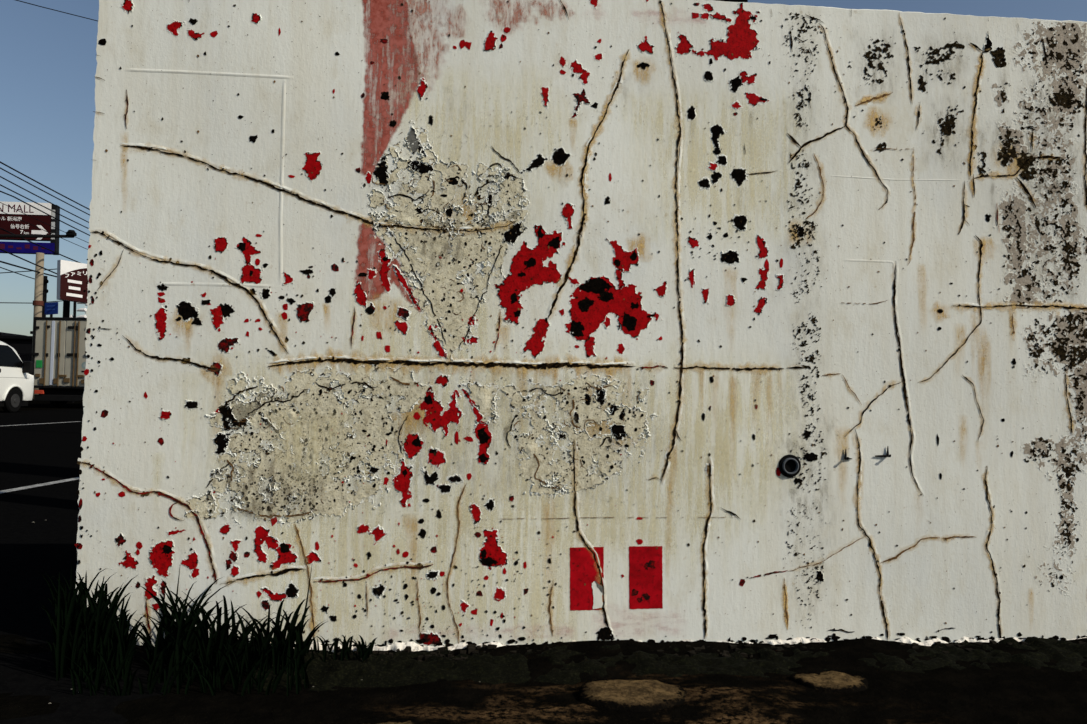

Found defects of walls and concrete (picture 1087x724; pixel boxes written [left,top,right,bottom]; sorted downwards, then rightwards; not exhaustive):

crack [77,458,467,640]
peeling [114,115,670,626]
crack [89,0,803,488]
crack [516,441,740,639]
peeling [674,0,772,116]
spalling [697,122,749,191]
peeling [685,213,786,316]
water stain [778,313,829,626]
water stain [848,39,965,92]
crack [744,13,1087,640]
water stain [973,22,1087,305]
water stain [1024,312,1087,572]